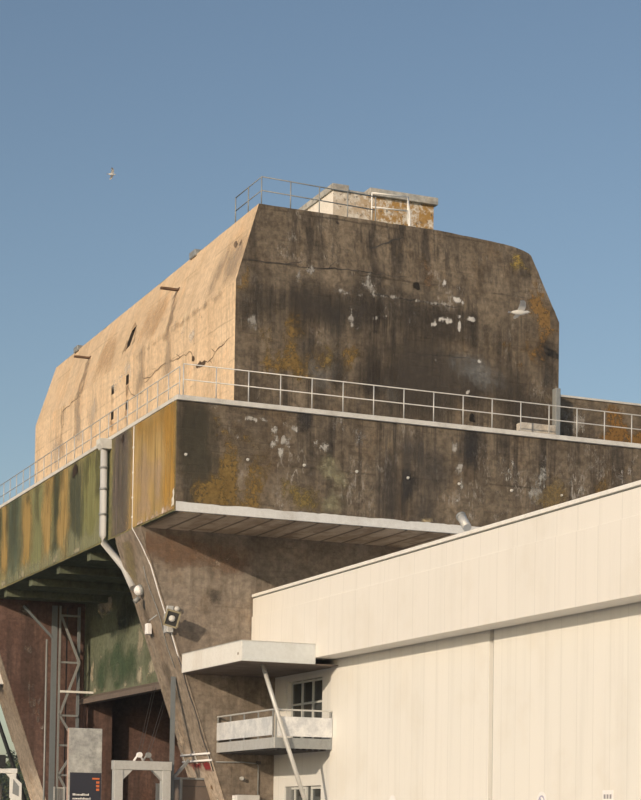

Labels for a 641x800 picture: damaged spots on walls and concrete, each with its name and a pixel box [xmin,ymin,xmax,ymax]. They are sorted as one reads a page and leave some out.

crack [128,338,229,396]
leakage [242,266,481,416]
leakage [493,374,540,423]
leakage [191,417,270,508]
leakage [271,413,311,458]
leakage [402,441,414,500]
leakage [452,431,478,489]
leakage [528,468,546,501]
leakage [7,496,21,585]
leakage [28,473,60,570]
leakage [68,474,82,557]